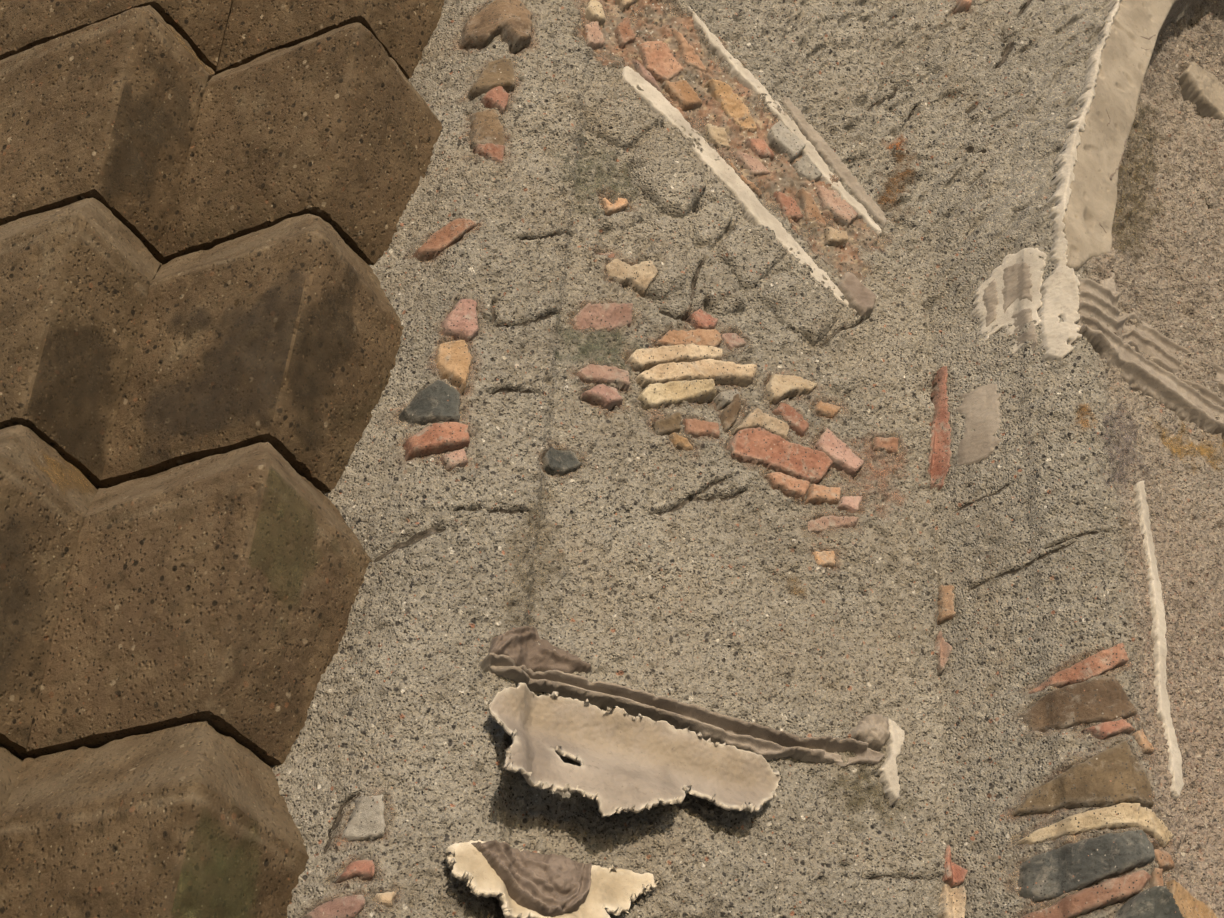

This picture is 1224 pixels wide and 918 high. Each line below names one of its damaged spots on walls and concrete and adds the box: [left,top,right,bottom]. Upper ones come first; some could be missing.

crack [651,477,745,515]
crack [954,484,1011,513]
crack [374,505,530,563]
crack [967,531,1099,591]
crack [862,874,938,882]